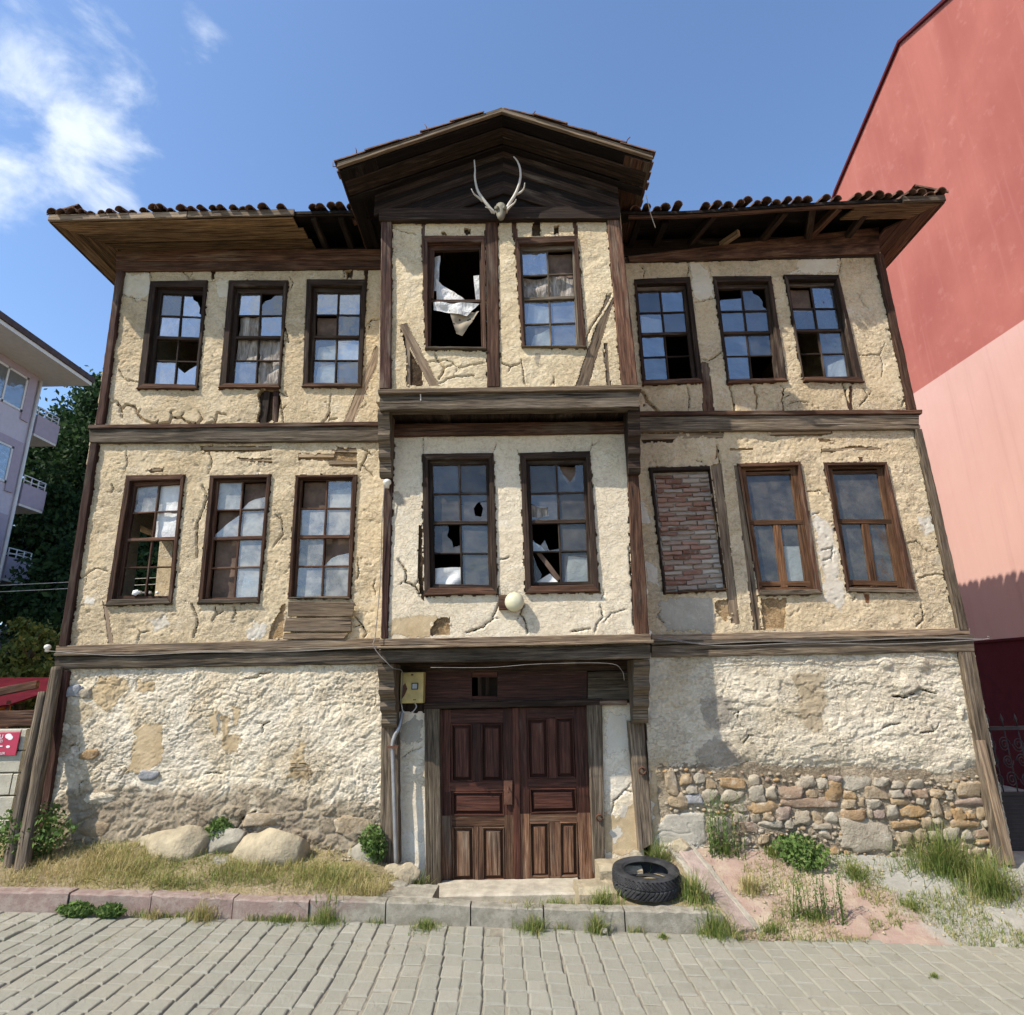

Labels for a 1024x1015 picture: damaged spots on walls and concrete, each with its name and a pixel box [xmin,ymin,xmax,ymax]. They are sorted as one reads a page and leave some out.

crack [432,354,478,379]
crack [108,377,225,424]
peeling [388,615,451,638]
crack [466,605,528,634]
spalling [760,595,788,630]
peeling [59,674,155,760]
peeling [124,723,164,781]
peeling [209,705,242,754]
peeling [791,673,828,731]